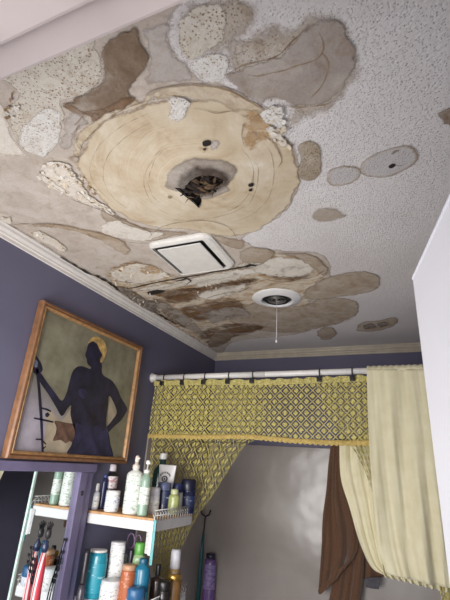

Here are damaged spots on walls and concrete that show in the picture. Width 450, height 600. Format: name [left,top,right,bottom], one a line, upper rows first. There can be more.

water stain [63,28,265,157]
peeling [0,4,356,293]
water stain [165,158,237,199]
water stain [297,141,418,186]
water stain [99,207,189,241]
water stain [313,209,344,221]
crack [60,257,261,325]
water stain [107,220,380,347]
water stain [357,318,398,332]